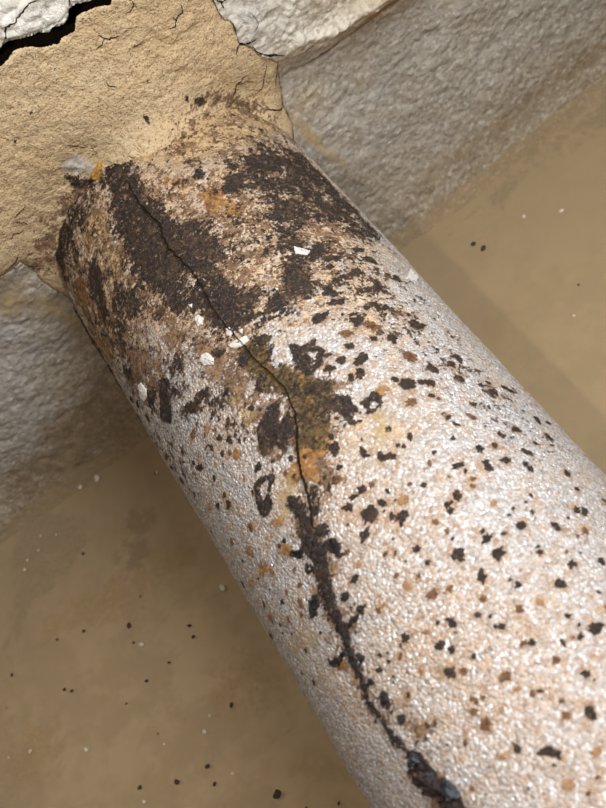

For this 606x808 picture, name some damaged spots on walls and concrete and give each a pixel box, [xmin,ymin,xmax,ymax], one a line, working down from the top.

spalling [0,0,293,295]
leakage [168,88,267,141]
crack [127,180,467,808]
corrosion [25,83,579,764]